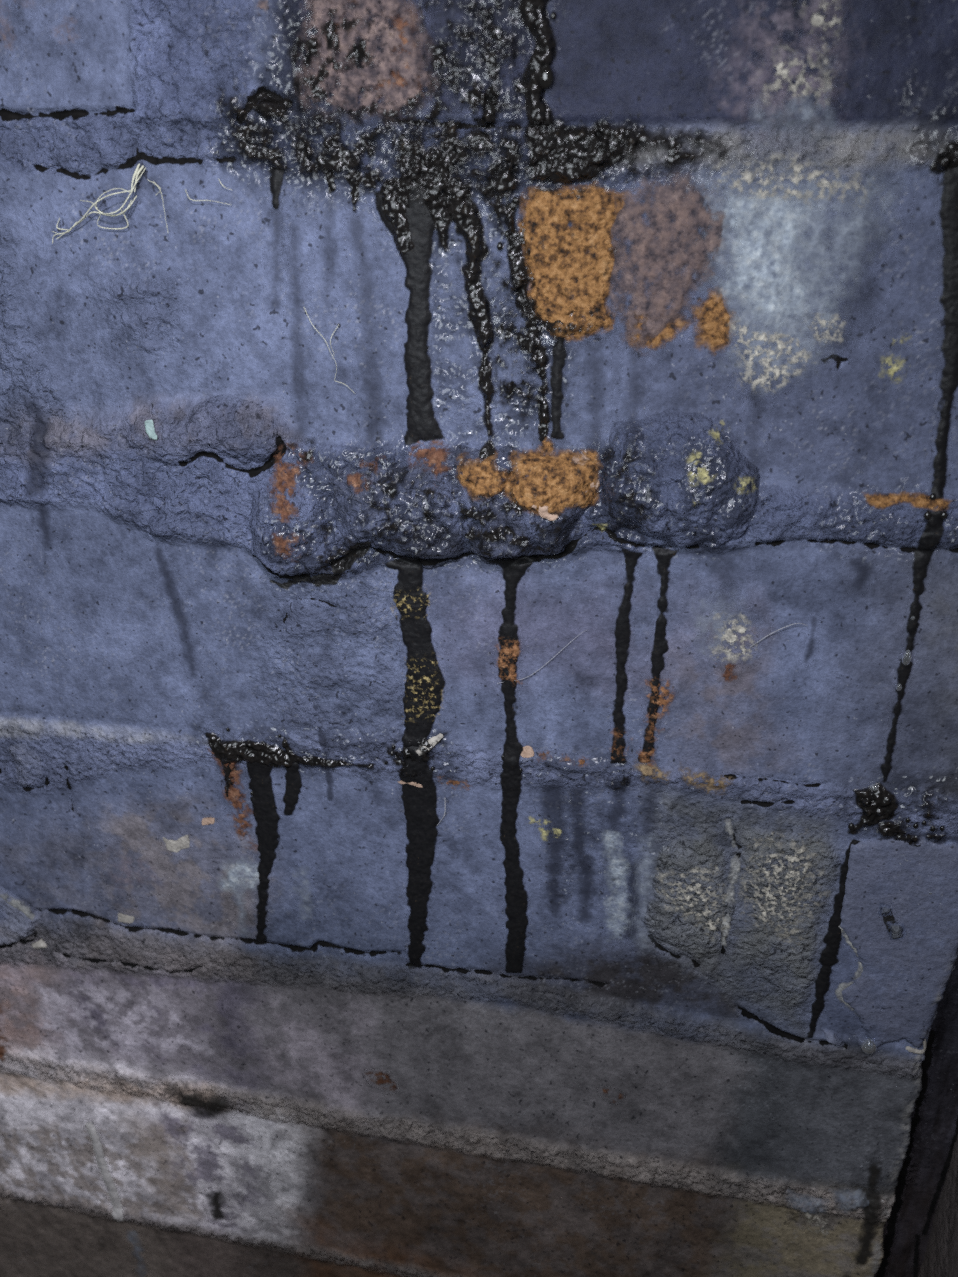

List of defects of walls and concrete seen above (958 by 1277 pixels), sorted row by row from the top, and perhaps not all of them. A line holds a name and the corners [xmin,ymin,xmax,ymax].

damp [269,167,284,209]
damp [374,177,567,458]
rust [518,176,736,351]
rust [271,446,311,555]
rust [347,463,377,493]
rust [410,437,599,521]
rust [865,493,949,511]
damp [881,167,958,782]
damp [385,556,445,969]
damp [484,556,561,973]
damp [607,546,676,790]
damp [808,839,861,1038]